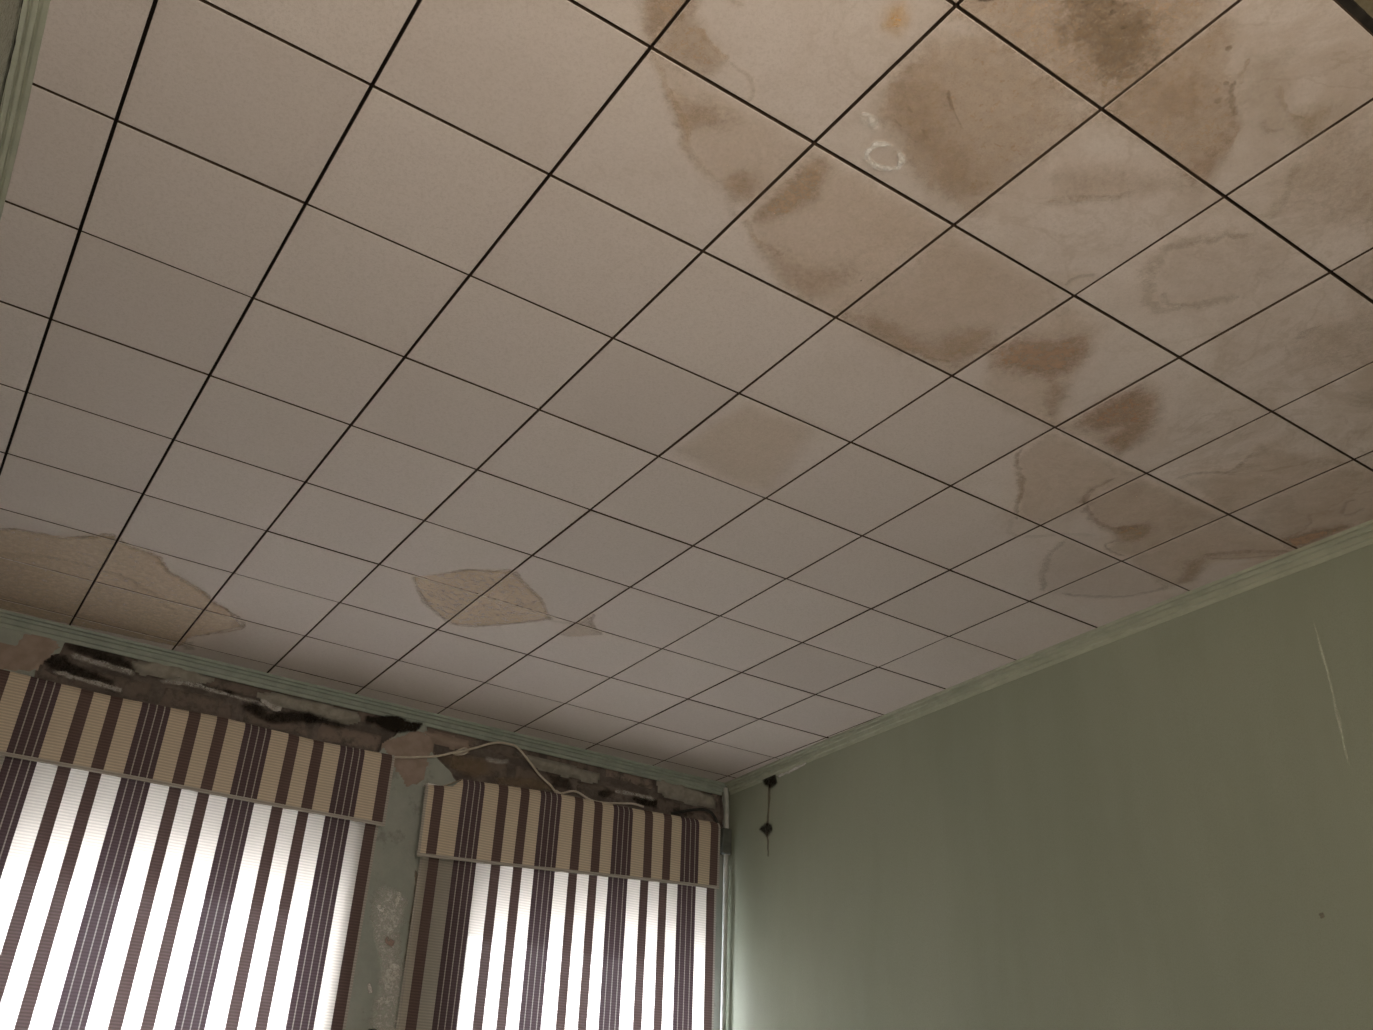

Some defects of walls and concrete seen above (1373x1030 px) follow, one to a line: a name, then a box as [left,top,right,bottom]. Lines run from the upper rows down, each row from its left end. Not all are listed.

spalling [34,643,721,823]